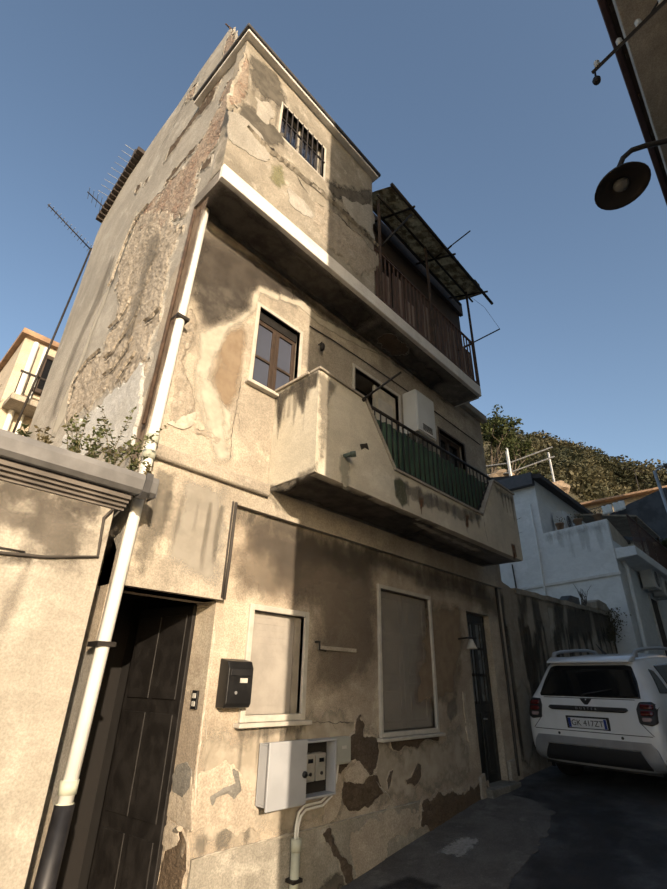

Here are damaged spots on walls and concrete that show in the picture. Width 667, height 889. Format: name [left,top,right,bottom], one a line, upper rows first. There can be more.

spalling [222,27,238,58]
spalling [64,52,251,444]
spalling [312,201,379,279]
water stain [191,188,444,461]
water stain [136,471,172,572]
water stain [170,483,223,578]
water stain [270,457,493,565]
water stain [201,606,469,848]
water stain [416,574,618,764]
peeling [157,760,258,889]
spalling [320,712,490,885]
water stain [379,877,440,889]